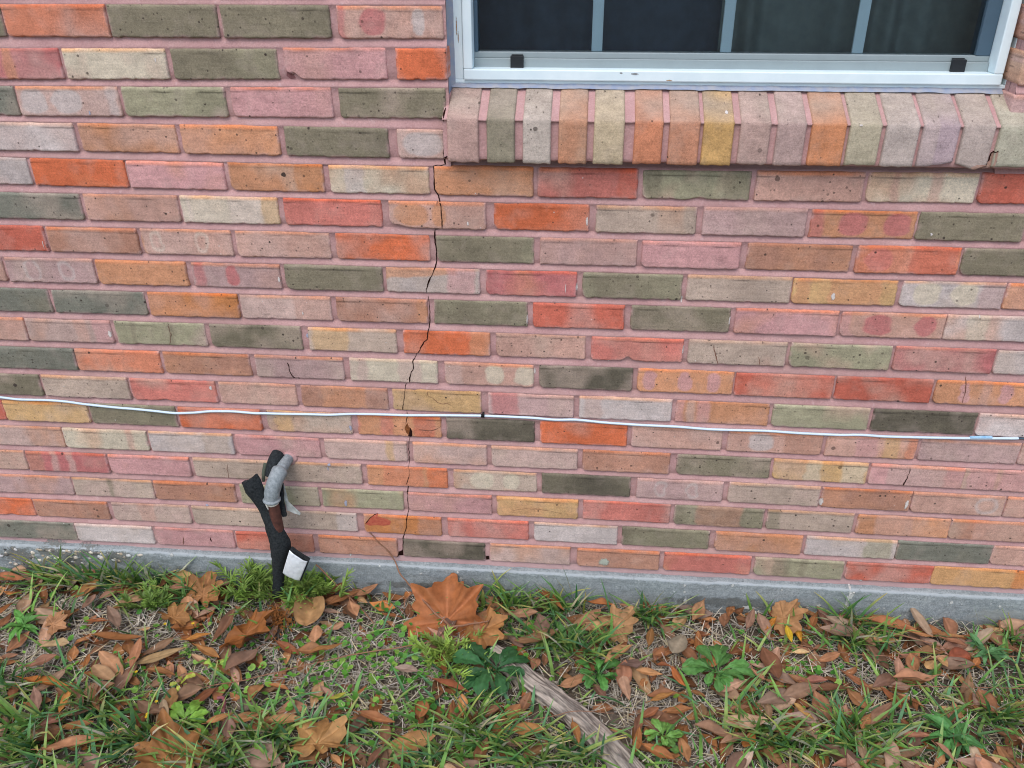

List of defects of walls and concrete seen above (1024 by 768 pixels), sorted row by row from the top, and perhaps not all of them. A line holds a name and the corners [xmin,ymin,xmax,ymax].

crack [402,108,450,550]